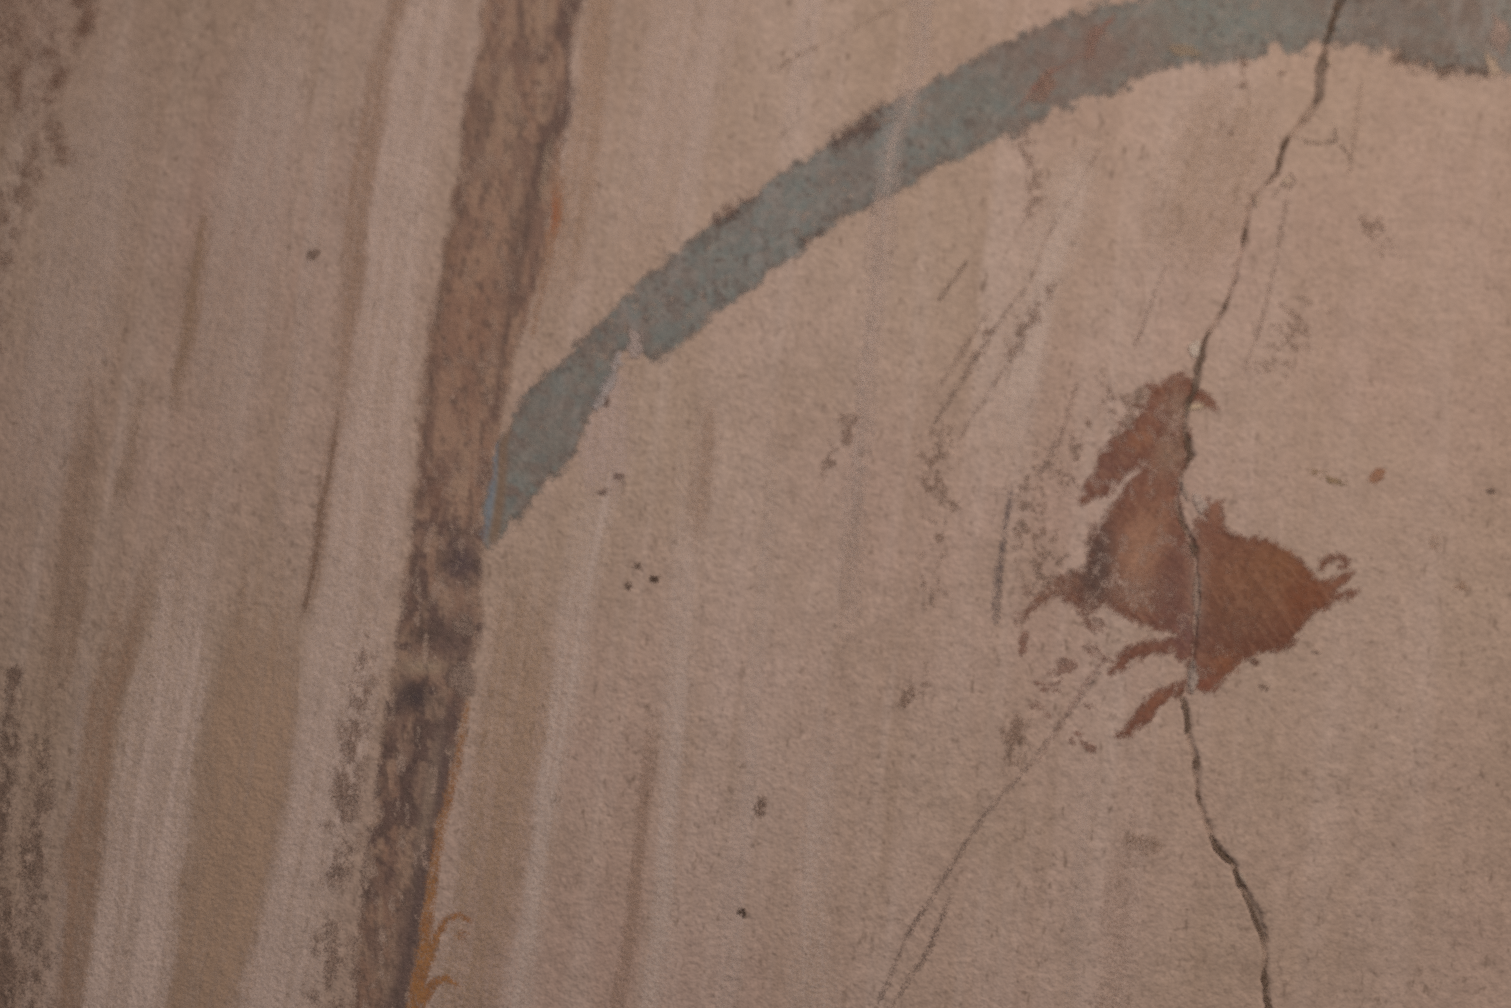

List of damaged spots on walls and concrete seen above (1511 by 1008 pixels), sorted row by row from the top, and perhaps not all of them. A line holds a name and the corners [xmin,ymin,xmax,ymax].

crack [1176,0,1351,1008]